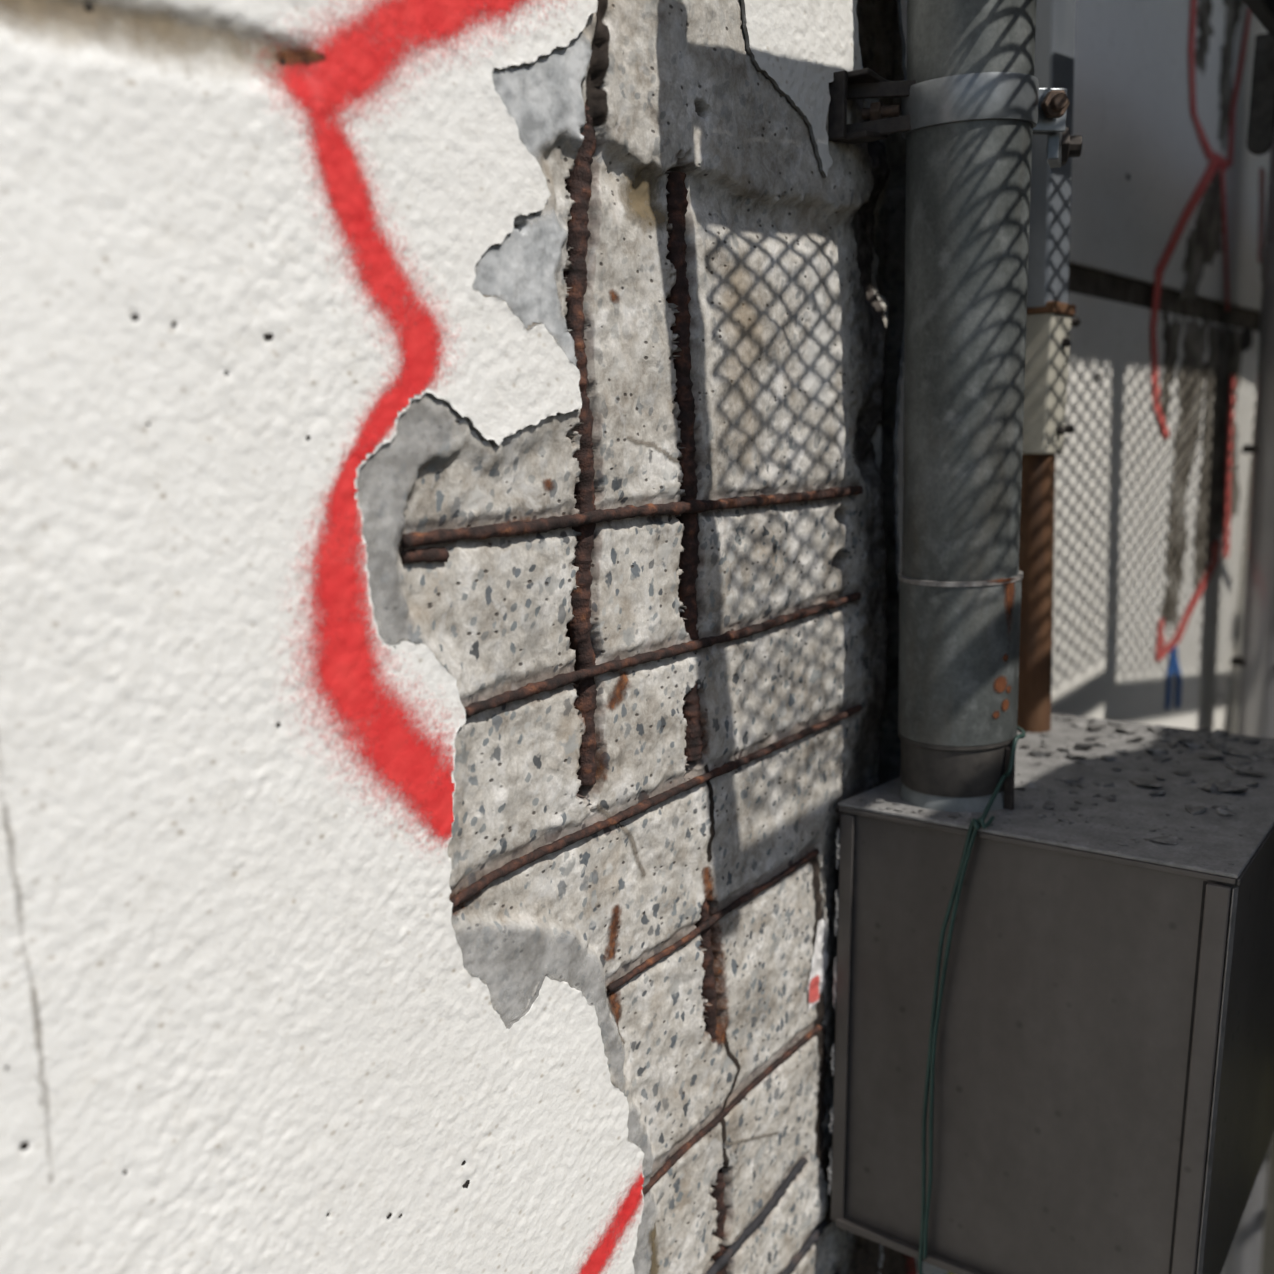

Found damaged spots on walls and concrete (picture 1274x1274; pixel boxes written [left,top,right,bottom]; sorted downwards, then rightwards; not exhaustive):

rust [626,168,669,226]
spalling [356,0,889,1274]
rust [608,672,630,709]
crack [705,764,715,862]
rust [606,905,621,960]
rust [702,867,728,1045]
rust [608,981,621,1024]
rust [650,1227,658,1274]